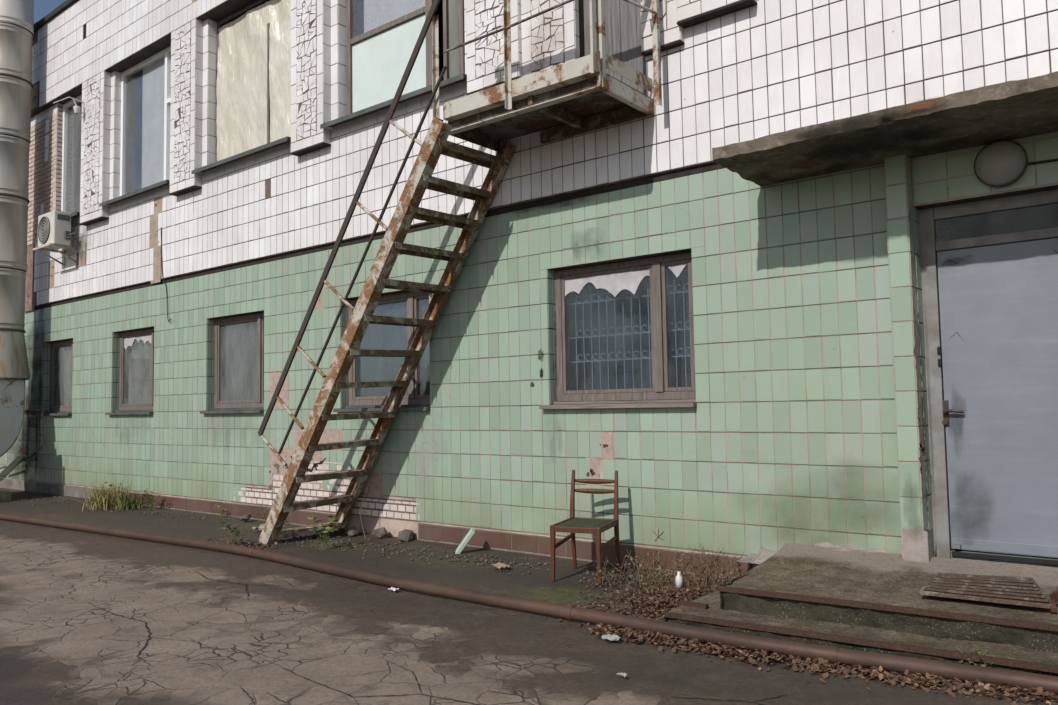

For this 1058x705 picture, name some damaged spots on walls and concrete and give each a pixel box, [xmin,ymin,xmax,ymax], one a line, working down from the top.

spalling [149,195,163,284]
spalling [271,372,289,410]
spalling [232,429,304,507]
spalling [294,426,352,513]
spalling [350,471,420,522]
spalling [585,432,613,487]
crack [85,601,213,667]
crack [260,657,480,705]